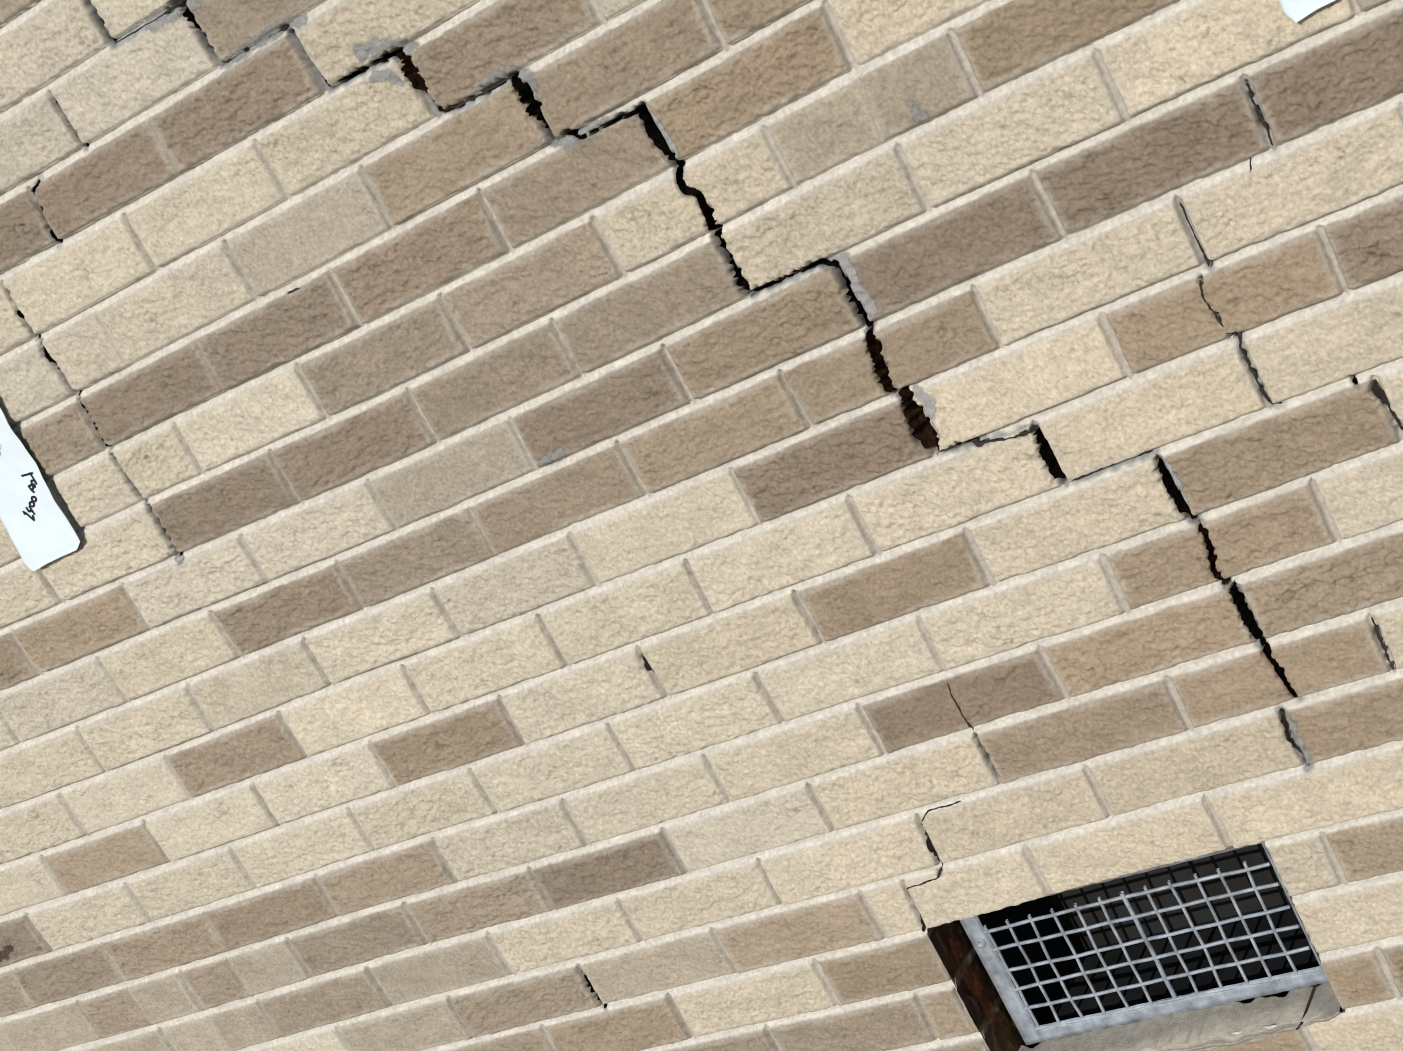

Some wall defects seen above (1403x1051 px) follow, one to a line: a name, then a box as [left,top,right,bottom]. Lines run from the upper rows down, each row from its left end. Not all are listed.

crack [96,0,295,63]
crack [32,179,63,243]
crack [17,310,116,459]
crack [325,49,1309,765]
crack [1352,375,1403,430]
crack [907,801,961,932]